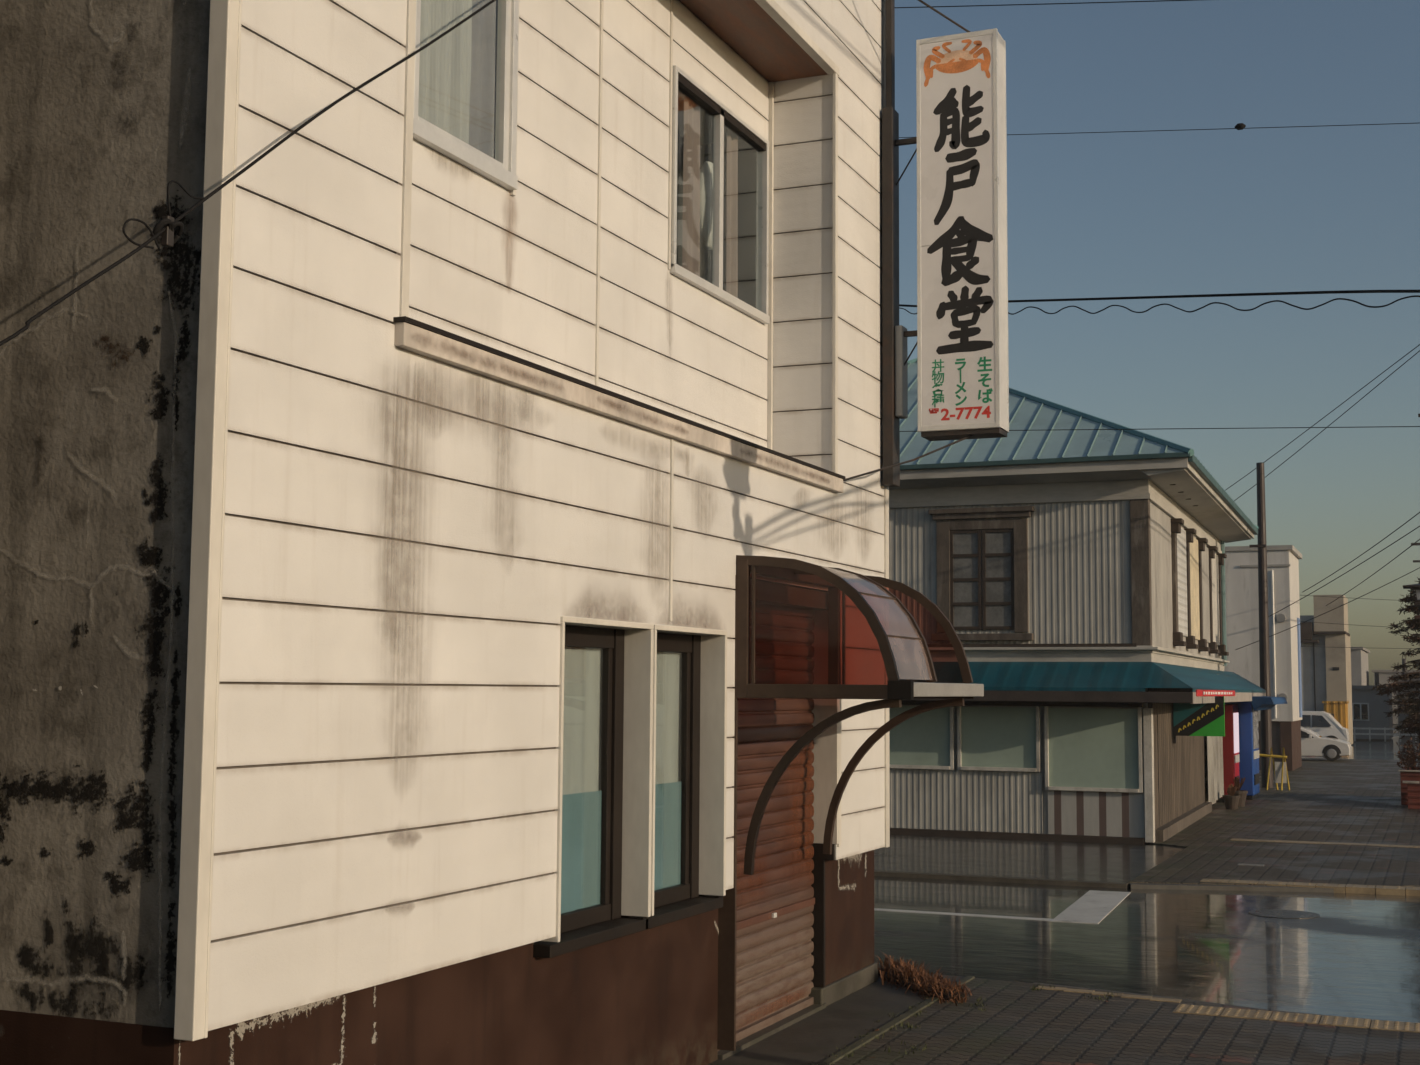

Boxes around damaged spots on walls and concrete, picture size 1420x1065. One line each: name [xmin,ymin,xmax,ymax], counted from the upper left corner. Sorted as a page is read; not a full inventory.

crack [6,453,174,1005]
damp [0,765,160,897]
damp [15,897,151,1018]